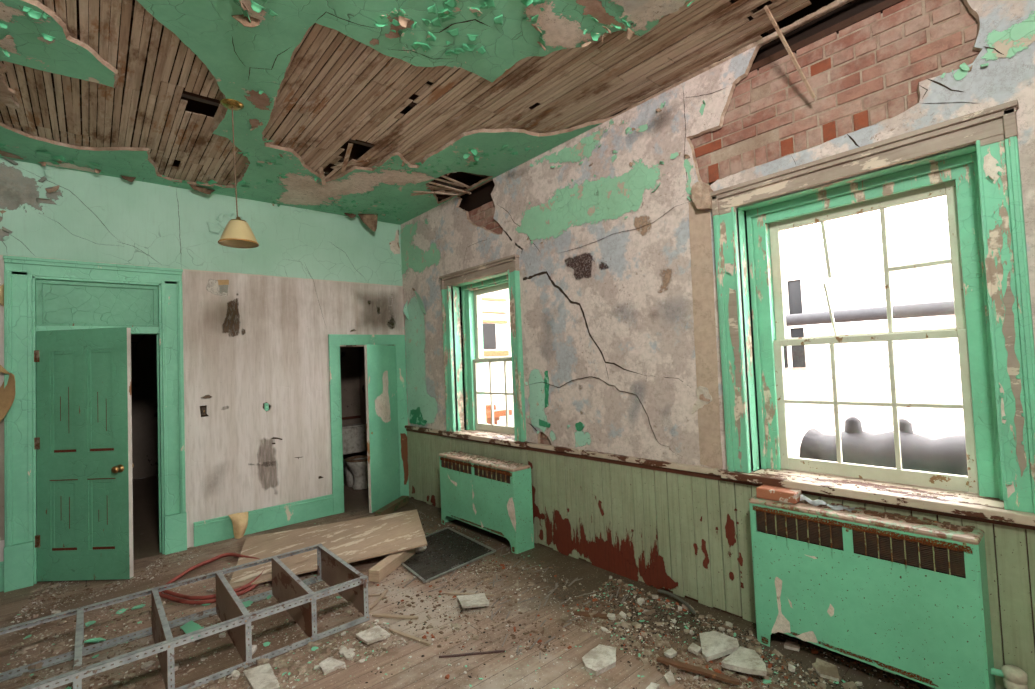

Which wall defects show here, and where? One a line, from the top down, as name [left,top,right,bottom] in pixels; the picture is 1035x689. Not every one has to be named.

spalling [0,0,119,88]
peeling [232,0,266,28]
peeling [0,150,101,241]
spalling [0,122,250,194]
flaking render [244,0,1035,244]
crack [683,87,727,176]
crack [463,202,691,456]
peeling [999,271,1027,501]
peeling [532,484,678,590]